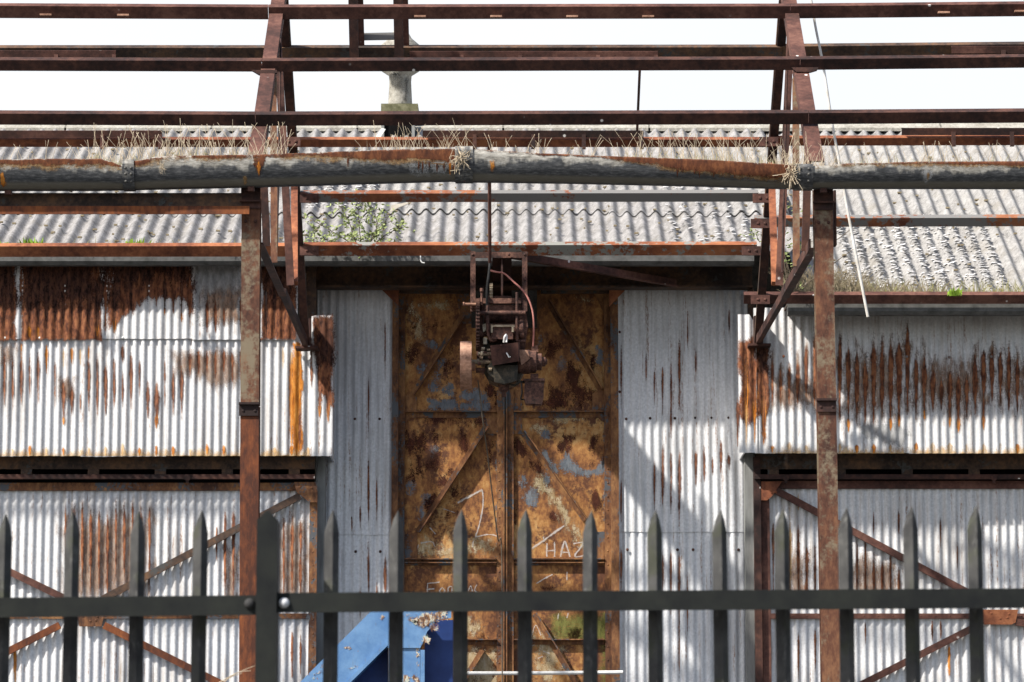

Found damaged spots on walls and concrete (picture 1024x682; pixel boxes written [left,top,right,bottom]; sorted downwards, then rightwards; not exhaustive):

rust [0,159,121,188]
rust [134,148,455,184]
rust [0,444,240,456]
rust [0,266,241,428]
rust [261,266,338,456]
peeling [518,428,605,520]
rust [653,446,681,526]
rust [694,332,816,484]
rust [835,323,1024,433]
rust [55,501,156,597]
rust [789,528,817,590]
rust [468,613,505,682]